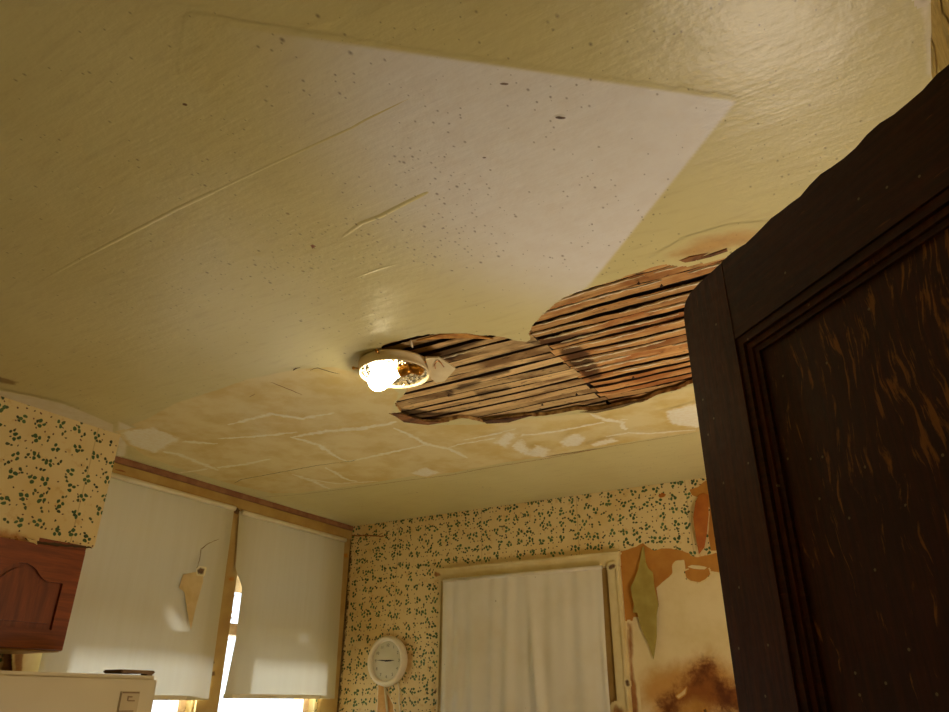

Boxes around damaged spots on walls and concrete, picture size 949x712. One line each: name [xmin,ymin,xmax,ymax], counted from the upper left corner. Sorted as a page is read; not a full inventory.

peeling [115,248,727,495]
peeling [693,493,709,554]
flaking render [630,546,730,664]
leakage [610,620,739,712]